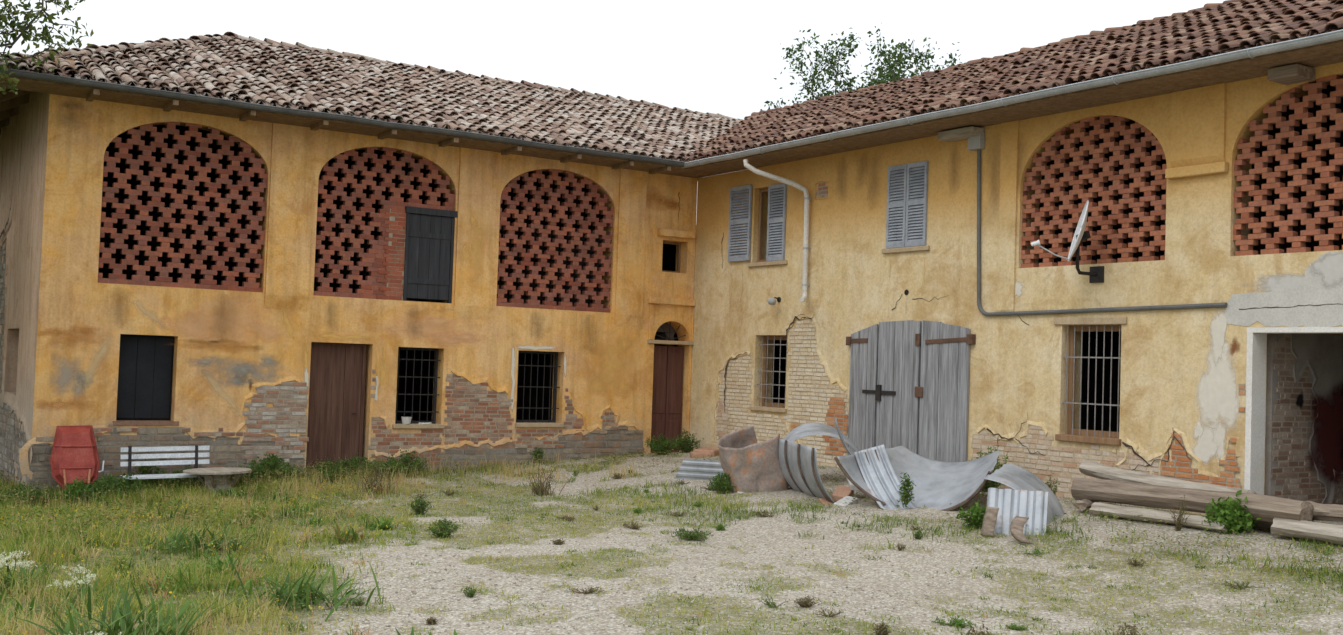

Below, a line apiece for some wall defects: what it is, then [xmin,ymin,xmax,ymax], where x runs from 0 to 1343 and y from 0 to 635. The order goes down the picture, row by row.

peeling [1312,253,1343,286]
spalling [93,376,309,483]
spalling [368,367,644,472]
spalling [714,315,849,468]
spalling [971,420,1241,498]
spalling [1238,384,1246,413]